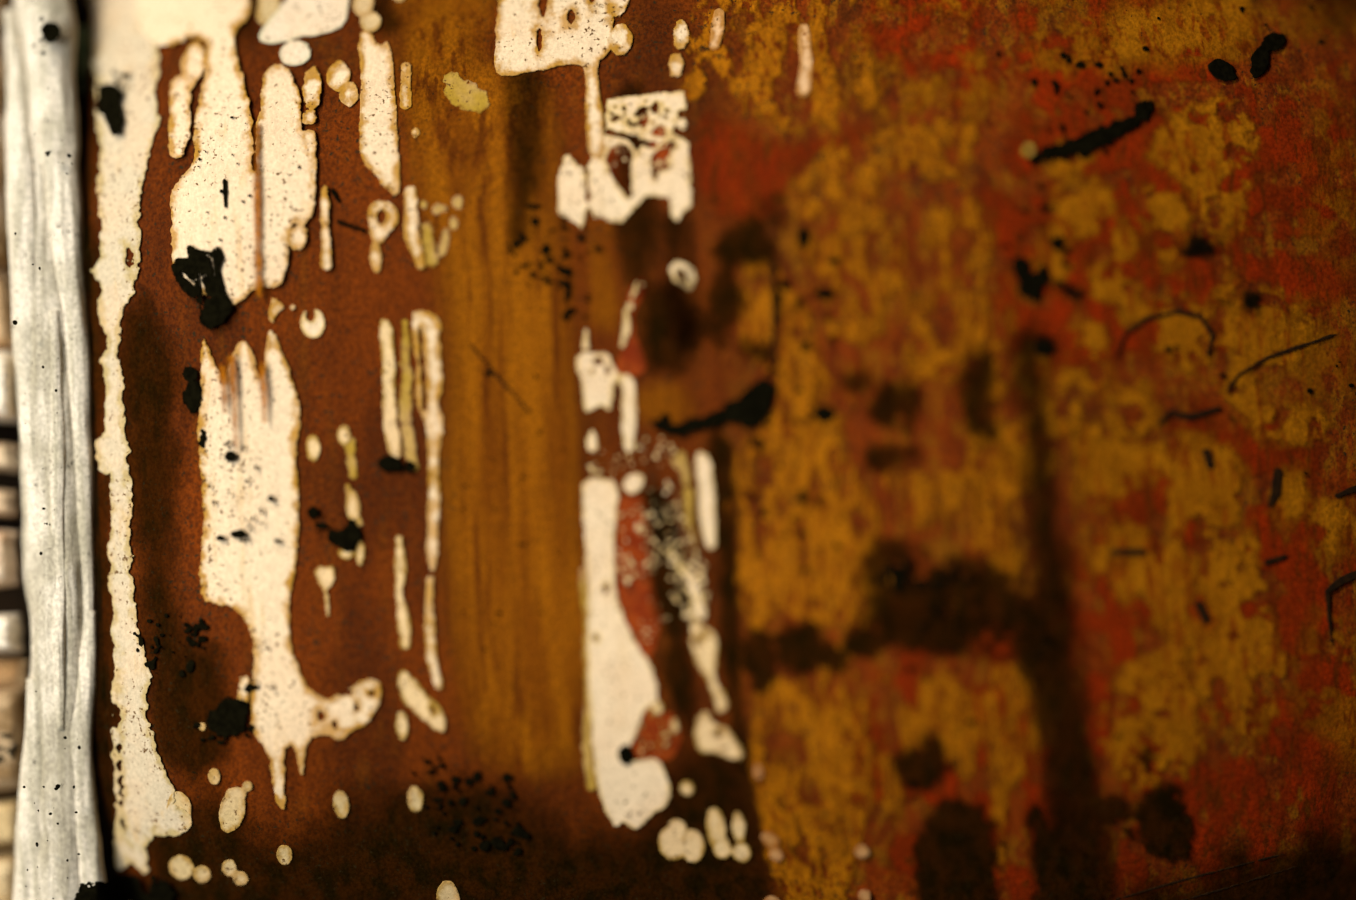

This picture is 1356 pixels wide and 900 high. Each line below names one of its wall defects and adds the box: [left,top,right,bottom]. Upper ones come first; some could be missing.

rust [254,125,262,297]
peeling [443,71,490,114]
peeling [494,0,693,229]
rust [982,0,1347,369]
rust [219,355,237,448]
rust [258,364,267,422]
peeling [84,0,463,874]
rust [412,18,580,763]
peeling [576,282,783,862]
peeling [169,855,249,886]
peeling [436,881,460,900]
rust [853,701,1037,900]